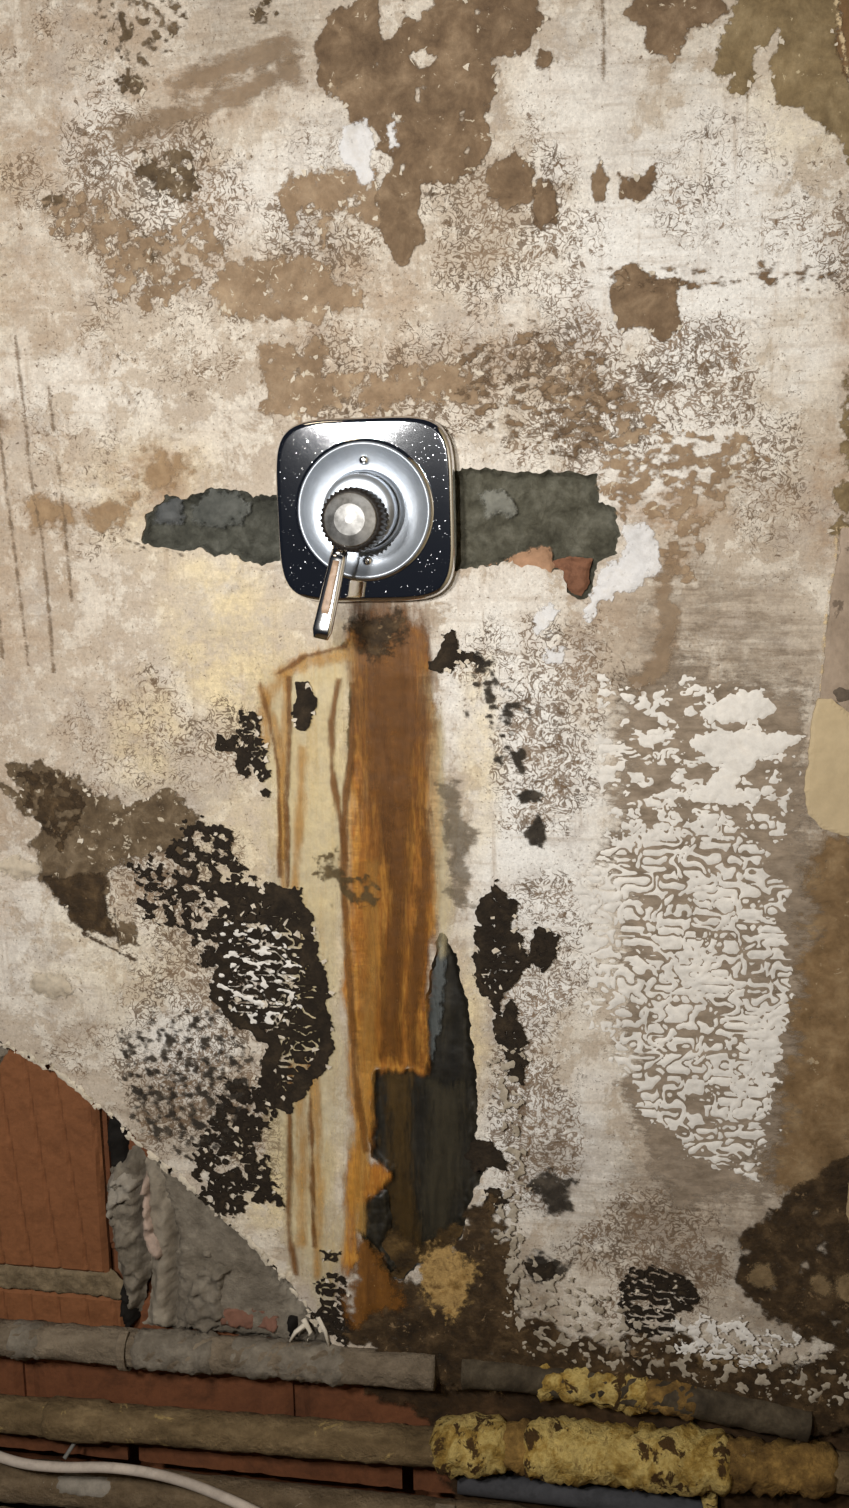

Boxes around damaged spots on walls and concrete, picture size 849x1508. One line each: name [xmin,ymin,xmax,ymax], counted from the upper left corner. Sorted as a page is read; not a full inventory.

peeling [623,0,849,165]
peeling [40,0,771,600]
peeling [608,260,834,342]
peeling [826,365,849,536]
water stain [214,710,272,798]
flaking render [0,1041,330,1346]
water stain [116,815,380,1226]
rust [260,601,443,1276]
water stain [438,780,560,1086]
water stain [306,835,849,1452]
flaking render [358,933,849,1406]
water stain [717,1490,849,1508]